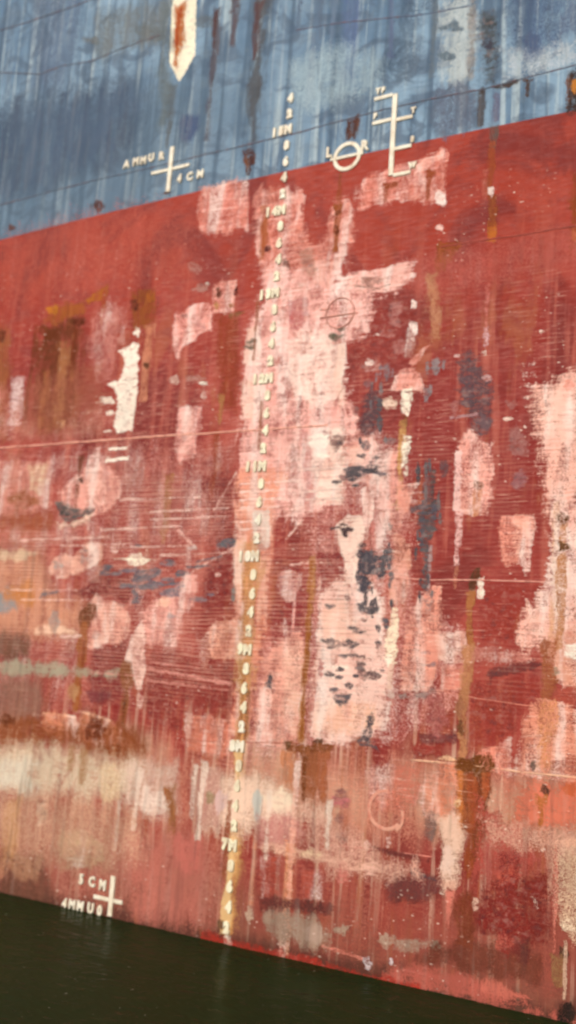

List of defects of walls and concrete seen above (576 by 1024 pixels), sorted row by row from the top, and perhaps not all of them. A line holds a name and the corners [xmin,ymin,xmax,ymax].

corrosion [482,124,499,242]
corrosion [20,284,109,442]
corrosion [129,286,159,403]
peeling [0,147,576,958]
corrosion [280,555,334,808]
corrosion [449,567,500,951]